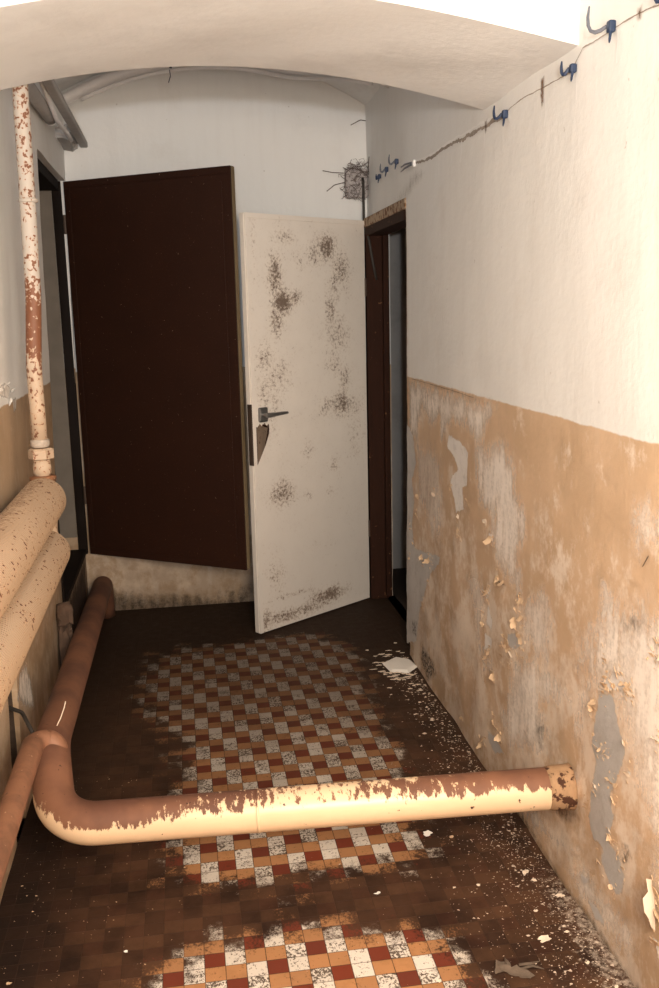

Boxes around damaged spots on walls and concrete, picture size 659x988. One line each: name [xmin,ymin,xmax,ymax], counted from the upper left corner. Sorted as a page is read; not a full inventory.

peeling [406,419,440,652]
peeling [447,435,471,542]
peeling [477,568,526,684]
peeling [476,711,503,754]
peeling [582,644,635,900]
peeling [643,875,659,958]